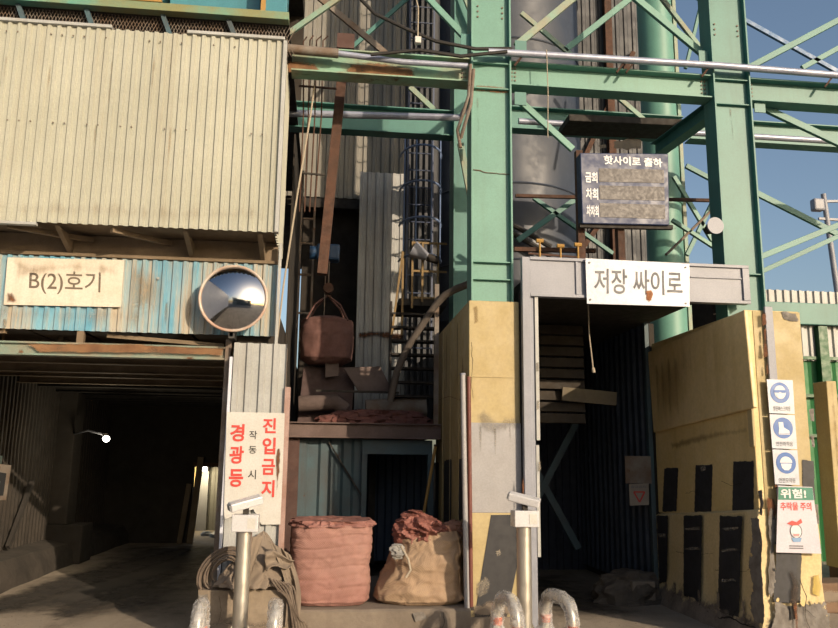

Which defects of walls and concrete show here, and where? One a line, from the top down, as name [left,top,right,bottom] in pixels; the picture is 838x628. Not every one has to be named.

corrosion [288,62,319,75]
corrosion [348,63,414,76]
spalling [749,490,830,628]